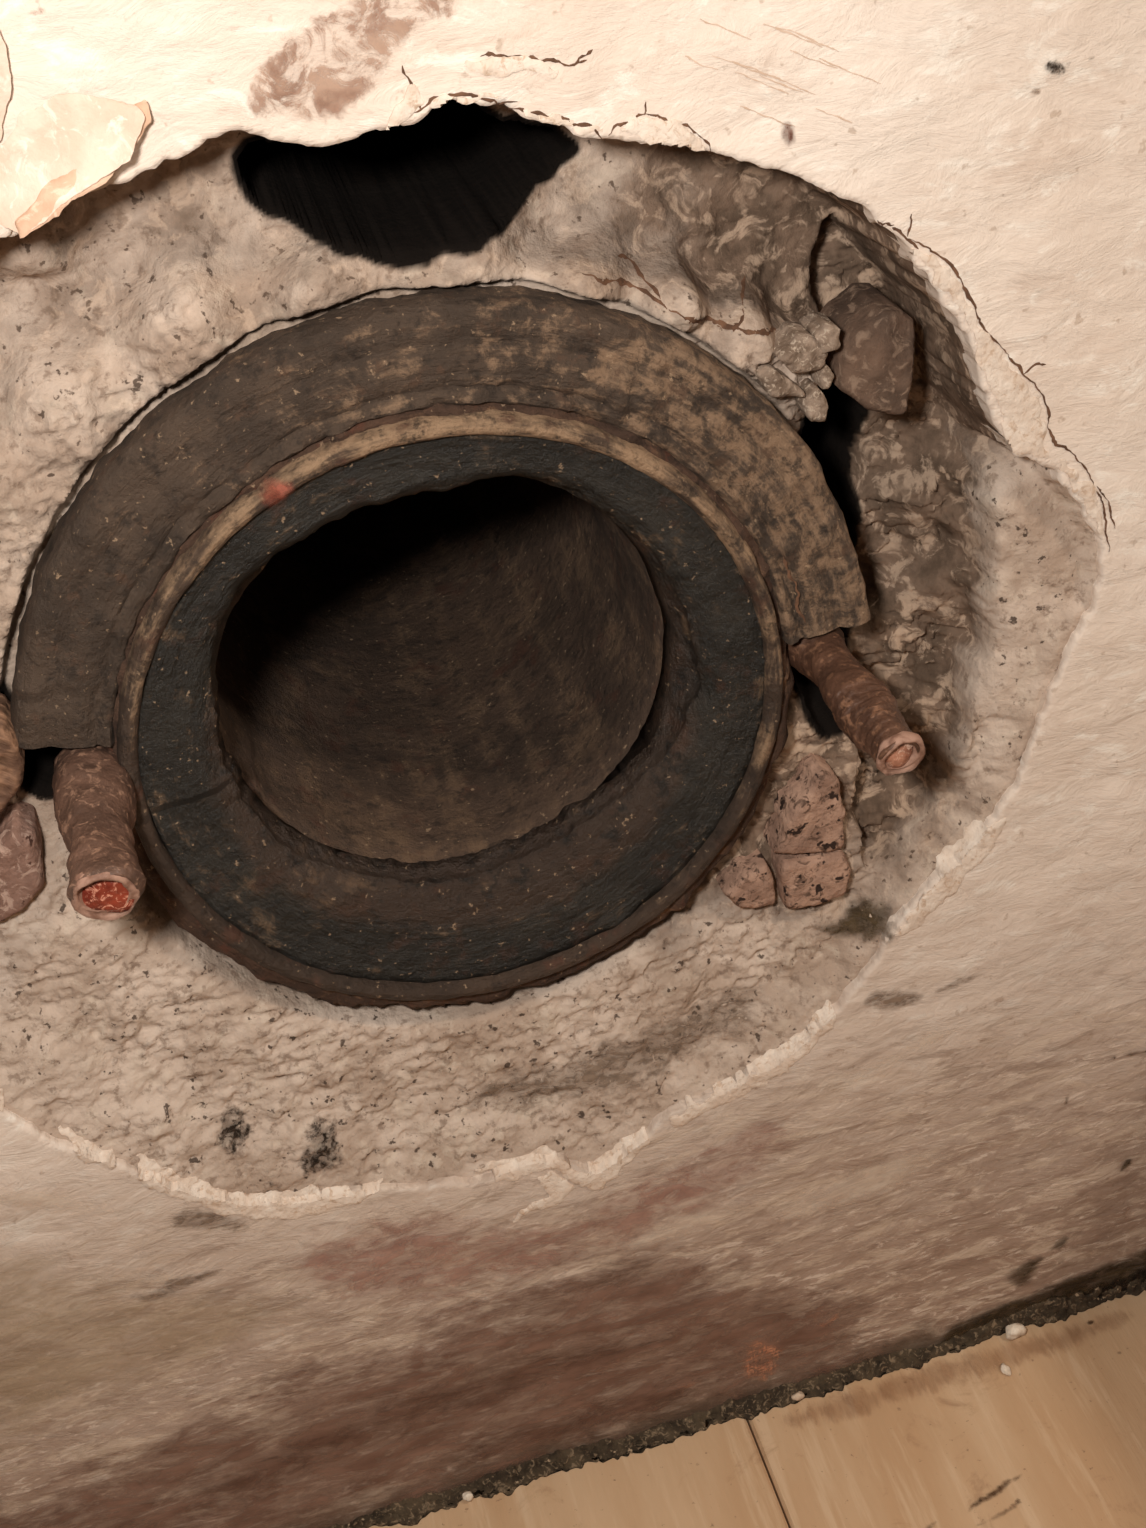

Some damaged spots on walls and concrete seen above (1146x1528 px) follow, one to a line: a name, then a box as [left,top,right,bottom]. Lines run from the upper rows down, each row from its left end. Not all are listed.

damp [251,0,451,117]
crack [481,49,593,67]
crack [402,65,712,153]
crack [582,254,776,336]
crack [877,214,1115,551]
spalling [0,34,1105,1223]
damp [174,1211,241,1229]
damp [305,1173,715,1290]
damp [944,1251,1146,1342]
damp [0,1265,859,1528]